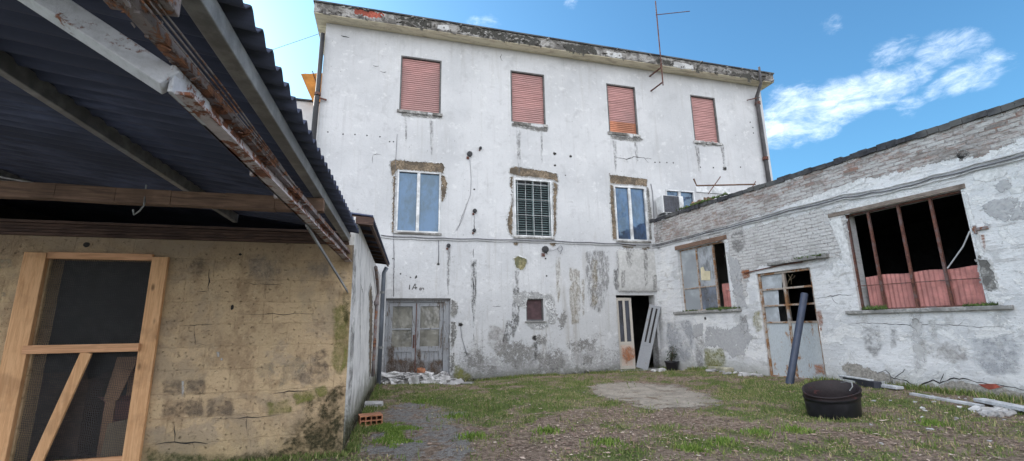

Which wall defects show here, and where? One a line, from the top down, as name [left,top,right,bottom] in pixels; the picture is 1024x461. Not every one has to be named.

spalling [318,6,631,61]
flaking render [389,159,449,234]
flaking render [506,152,566,272]
flaking render [608,106,1024,309]
flaking render [449,290,596,376]
flaking render [693,317,753,358]
crack [879,369,1022,390]
crack [159,429,207,446]